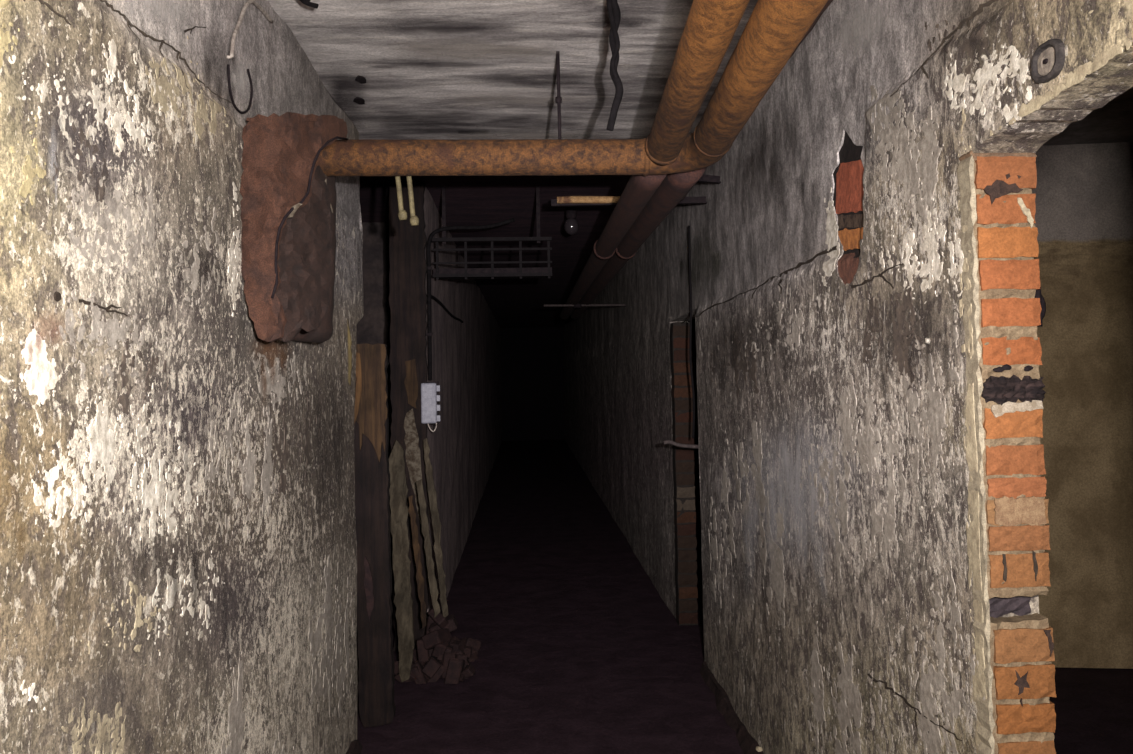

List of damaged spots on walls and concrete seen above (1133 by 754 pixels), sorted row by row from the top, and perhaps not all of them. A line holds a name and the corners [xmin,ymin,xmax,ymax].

crack [23,0,71,25]
crack [100,0,231,103]
crack [683,245,837,323]
crack [851,264,903,289]
peeling [709,0,1133,754]